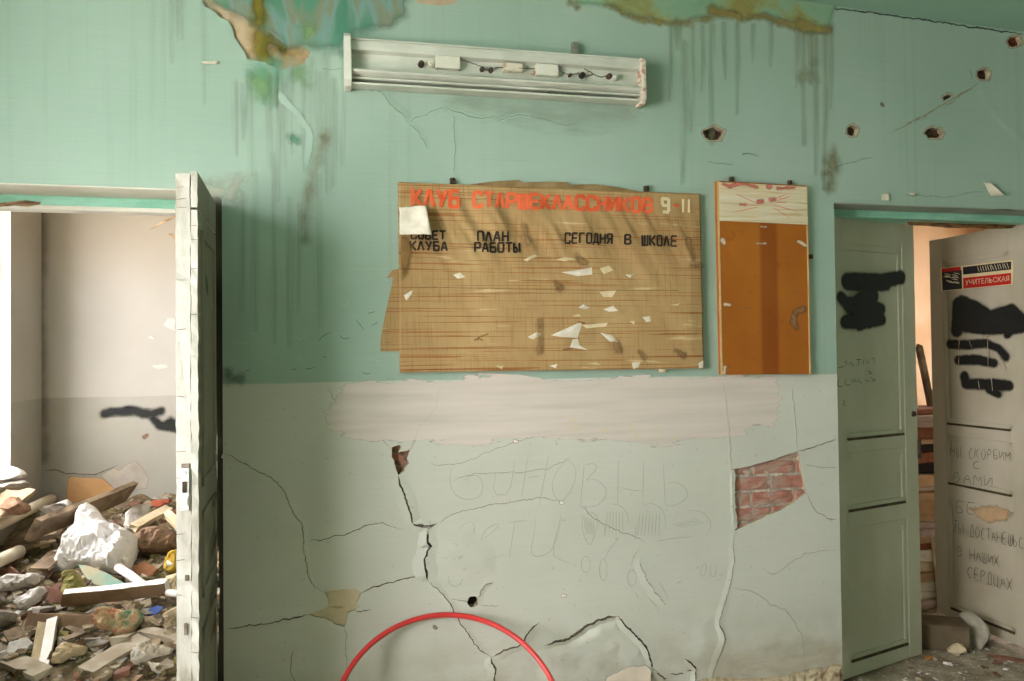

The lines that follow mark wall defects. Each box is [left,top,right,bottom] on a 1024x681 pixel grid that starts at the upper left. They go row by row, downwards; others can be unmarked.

peeling [202,0,310,70]
flaking render [701,125,726,142]
flaking render [845,123,860,138]
spalling [888,67,992,140]
flaking render [392,445,409,474]
flaking render [732,452,804,528]
crack [221,382,837,681]
flaking render [311,588,361,626]